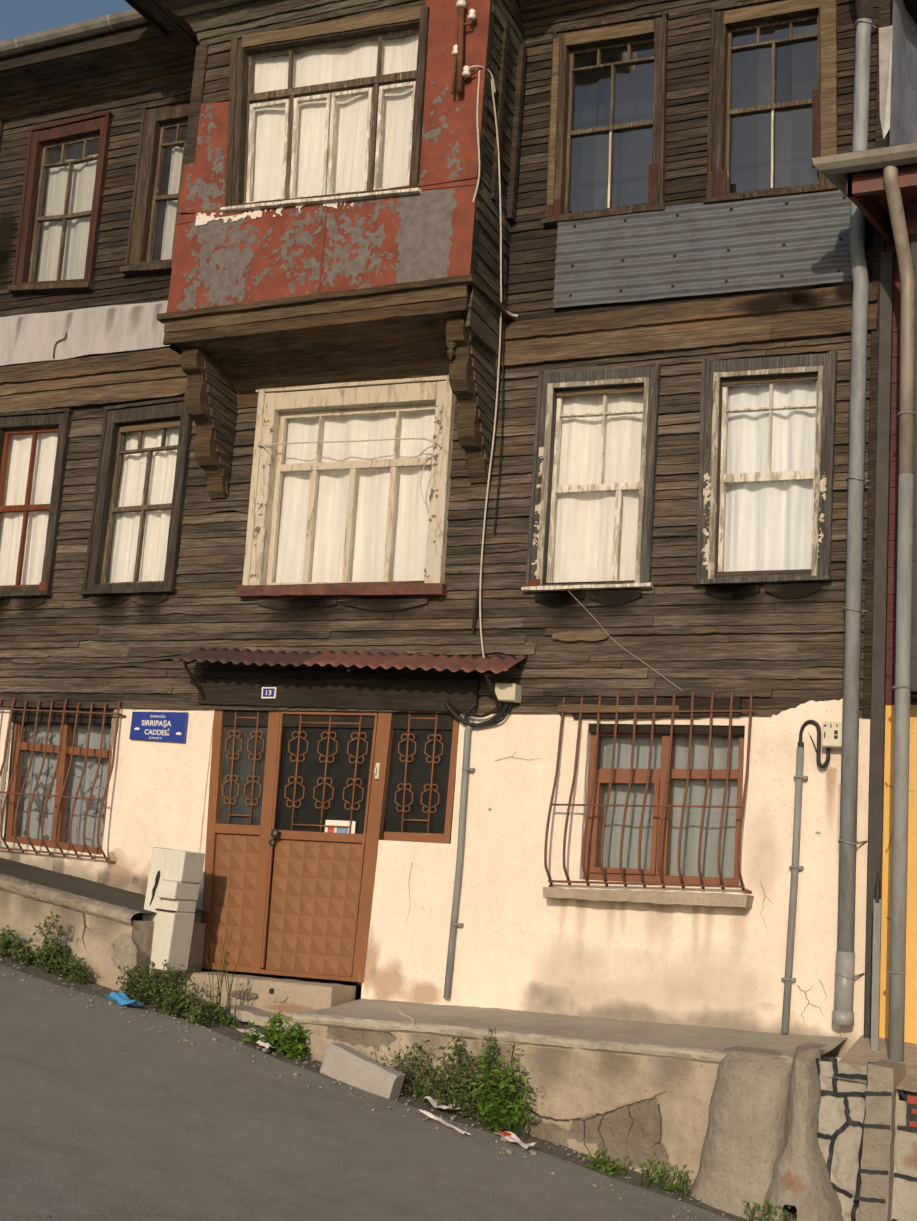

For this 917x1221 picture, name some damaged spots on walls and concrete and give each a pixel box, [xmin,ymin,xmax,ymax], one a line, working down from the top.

peeling [176,76,470,311]
crack [797,979,827,1021]
crack [511,1043,671,1172]